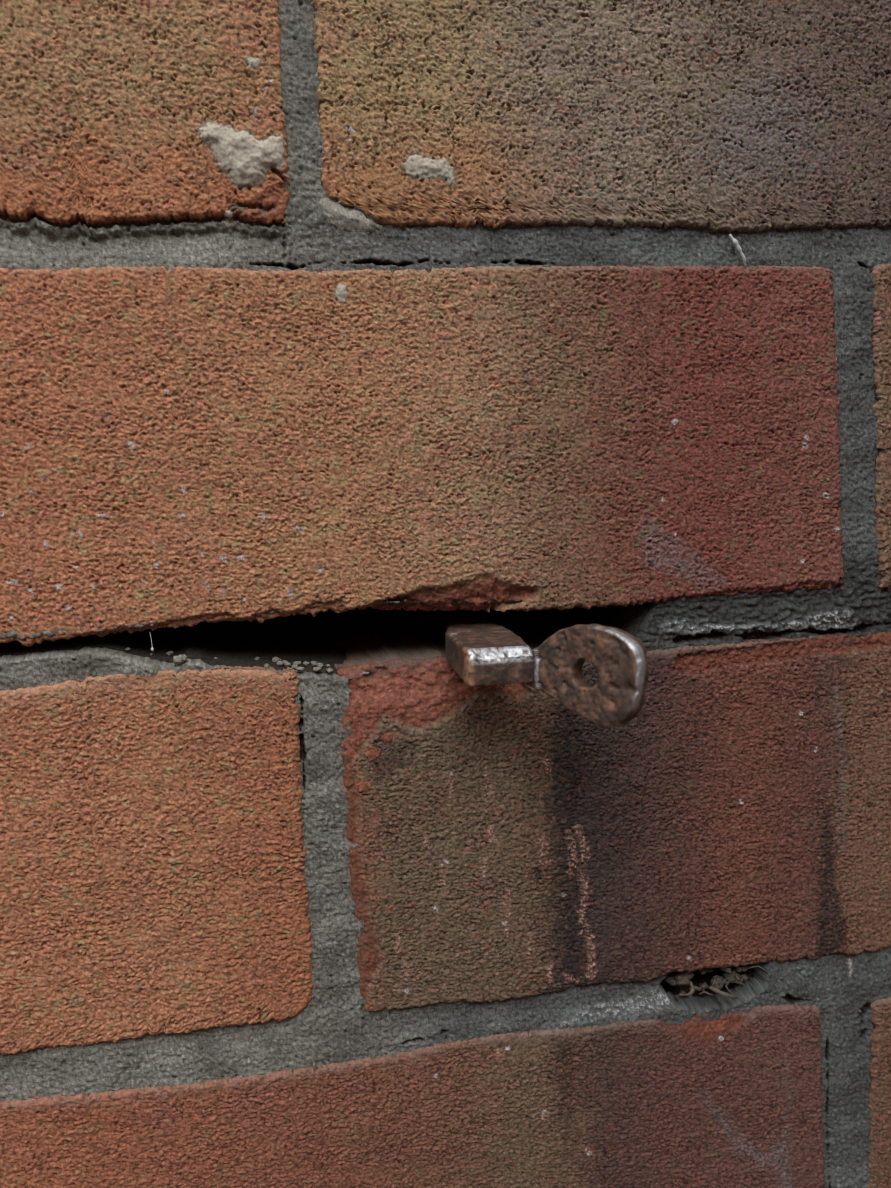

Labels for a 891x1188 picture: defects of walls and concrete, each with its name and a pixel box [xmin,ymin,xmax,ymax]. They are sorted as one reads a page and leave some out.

crack [0,602,651,789]
crack [672,622,891,643]